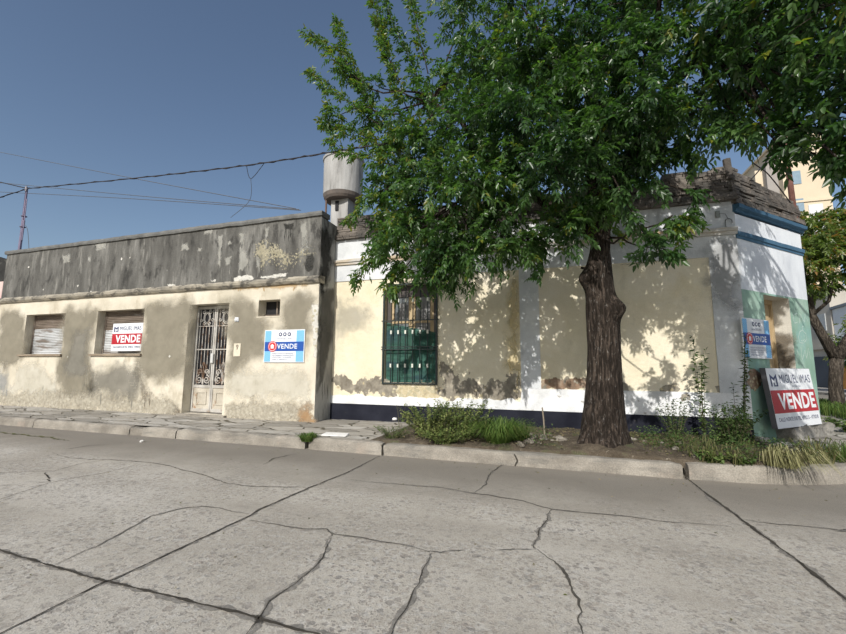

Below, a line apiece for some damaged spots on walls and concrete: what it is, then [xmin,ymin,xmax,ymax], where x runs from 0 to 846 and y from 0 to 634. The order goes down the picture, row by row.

damp [217,233,261,277]
damp [0,299,194,409]
damp [225,223,334,399]
peeling [331,361,521,401]
peeling [541,376,586,390]
crack [0,432,846,634]